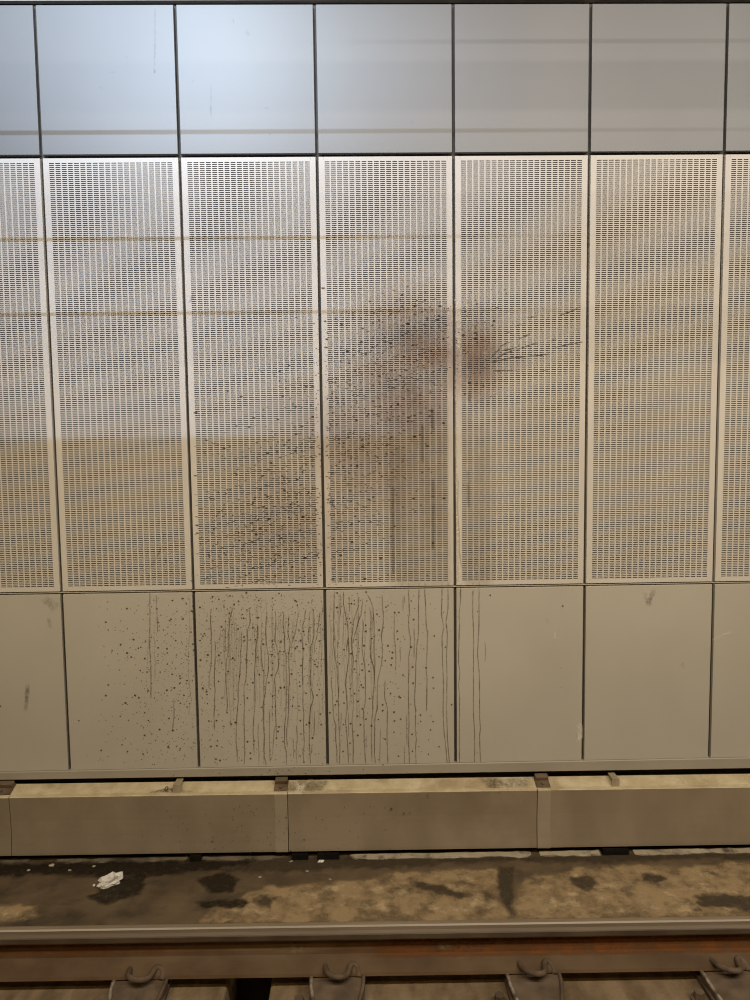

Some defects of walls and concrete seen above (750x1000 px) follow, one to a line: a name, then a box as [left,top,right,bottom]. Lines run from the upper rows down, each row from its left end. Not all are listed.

leakage [111,286,548,765]
leakage [0,850,750,923]